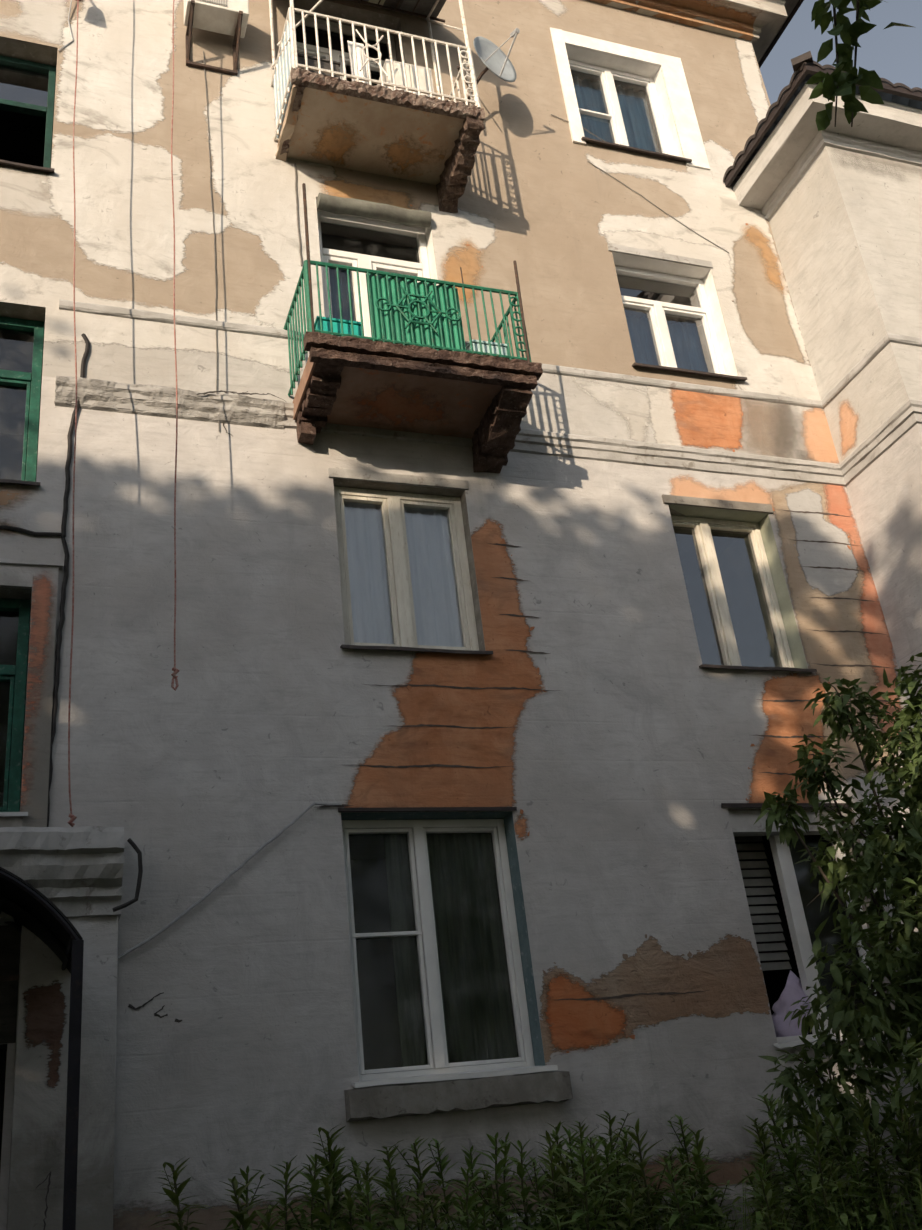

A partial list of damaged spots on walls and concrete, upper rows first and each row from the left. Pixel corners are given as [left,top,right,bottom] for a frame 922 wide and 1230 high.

peeling [732,223,805,364]
spalling [55,376,285,430]
peeling [671,388,744,452]
peeling [803,403,858,464]
peeling [340,519,546,840]
peeling [670,476,901,803]
spalling [22,980,67,1088]
spalling [540,934,770,1065]